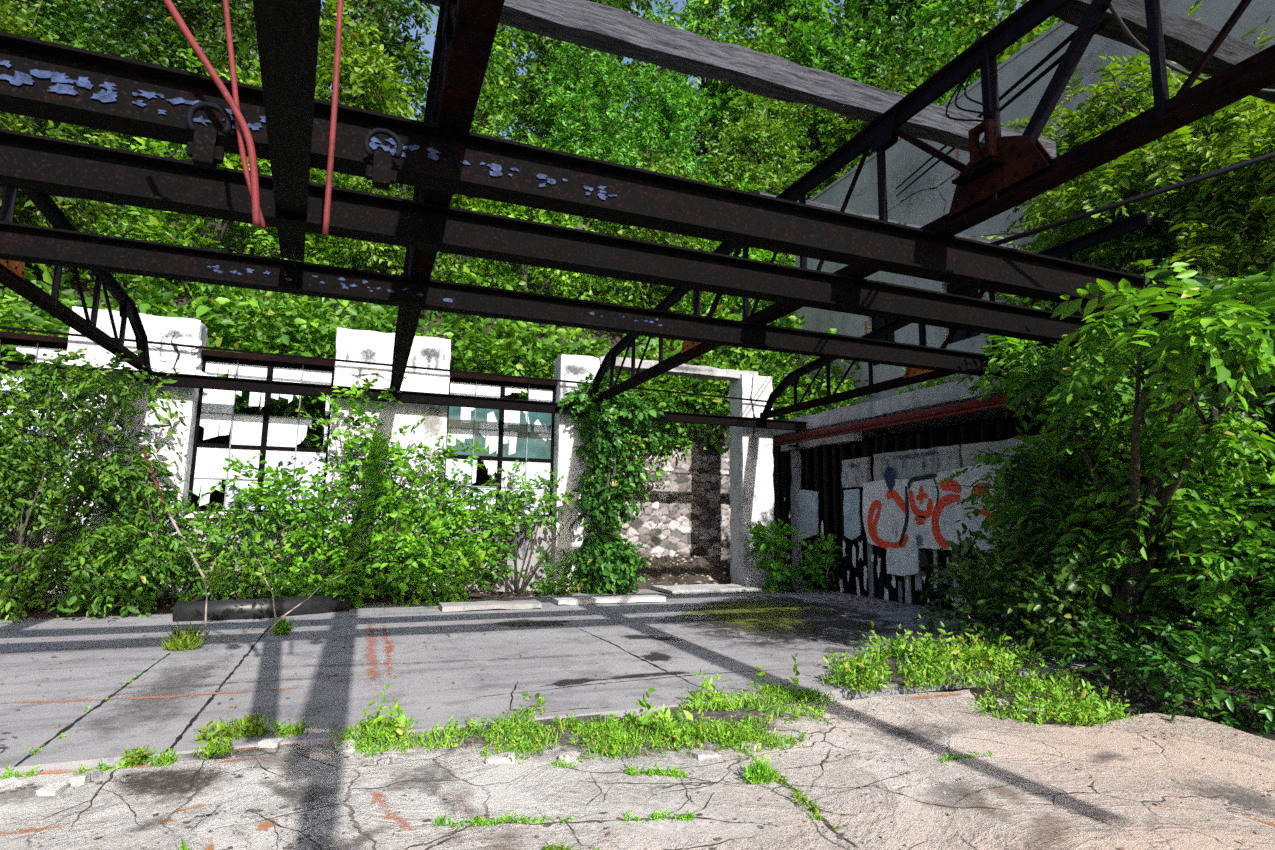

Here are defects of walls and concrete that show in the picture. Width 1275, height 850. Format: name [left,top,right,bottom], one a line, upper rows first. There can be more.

peeling [0,60,266,130]
peeling [370,137,441,160]
peeling [461,160,519,176]
peeling [536,174,568,187]
peeling [583,185,617,200]
leakage [613,596,911,679]
leakage [552,678,598,686]
crack [190,743,338,781]
crack [40,761,140,831]
crack [425,748,1017,850]
crack [254,812,354,850]